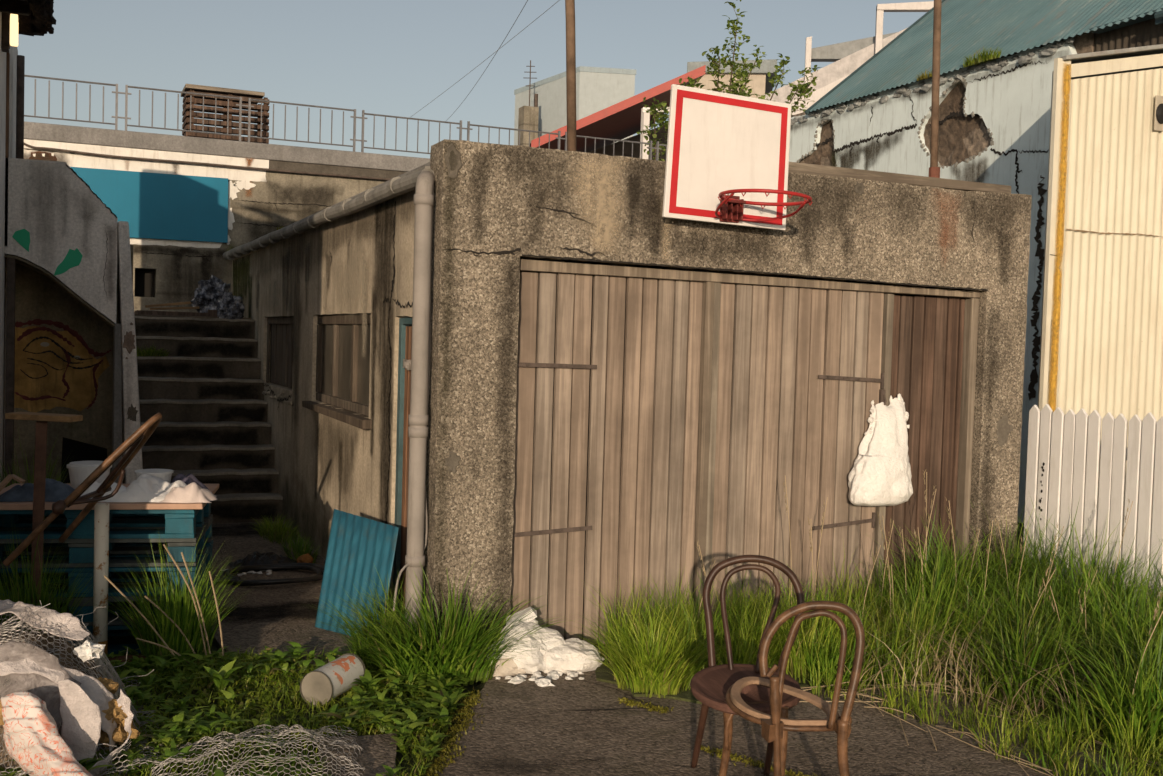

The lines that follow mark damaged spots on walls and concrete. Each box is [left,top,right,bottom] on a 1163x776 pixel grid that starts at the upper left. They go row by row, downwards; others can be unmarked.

spalling [797,120,837,167]
crack [833,96,917,166]
spalling [917,78,994,169]
peeling [227,180,256,245]
water stain [250,186,332,240]
water stain [581,162,618,245]
water stain [134,245,329,545]
water stain [323,201,393,524]